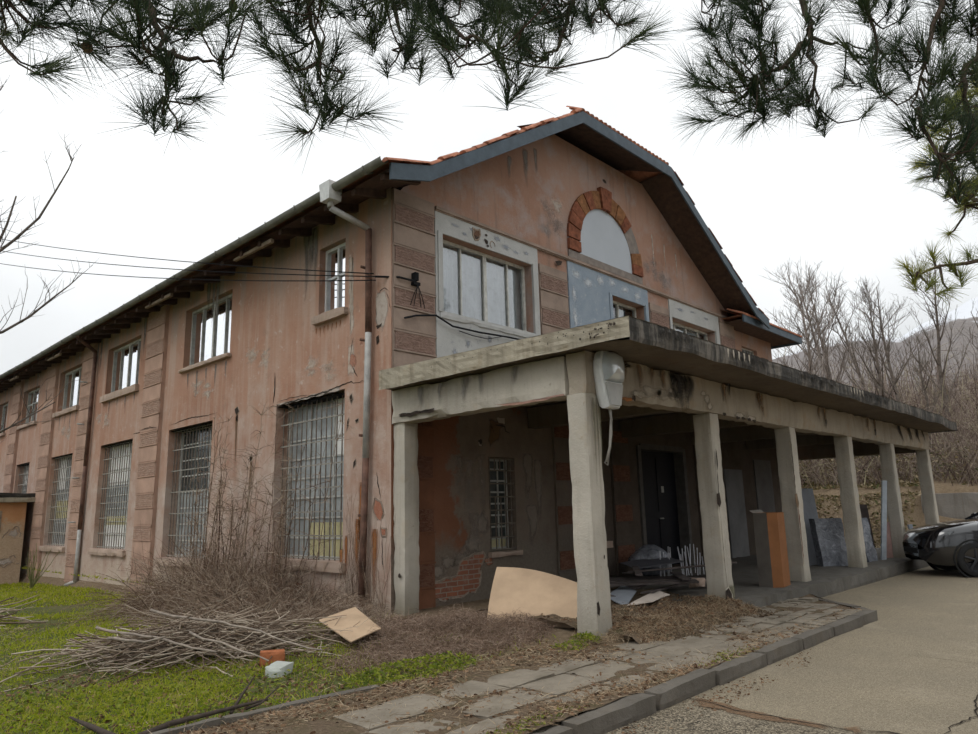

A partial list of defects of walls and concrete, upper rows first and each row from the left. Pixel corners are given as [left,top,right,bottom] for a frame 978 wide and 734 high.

damp [624,361,694,404]
crack [689,697,900,734]
crack [944,695,978,734]